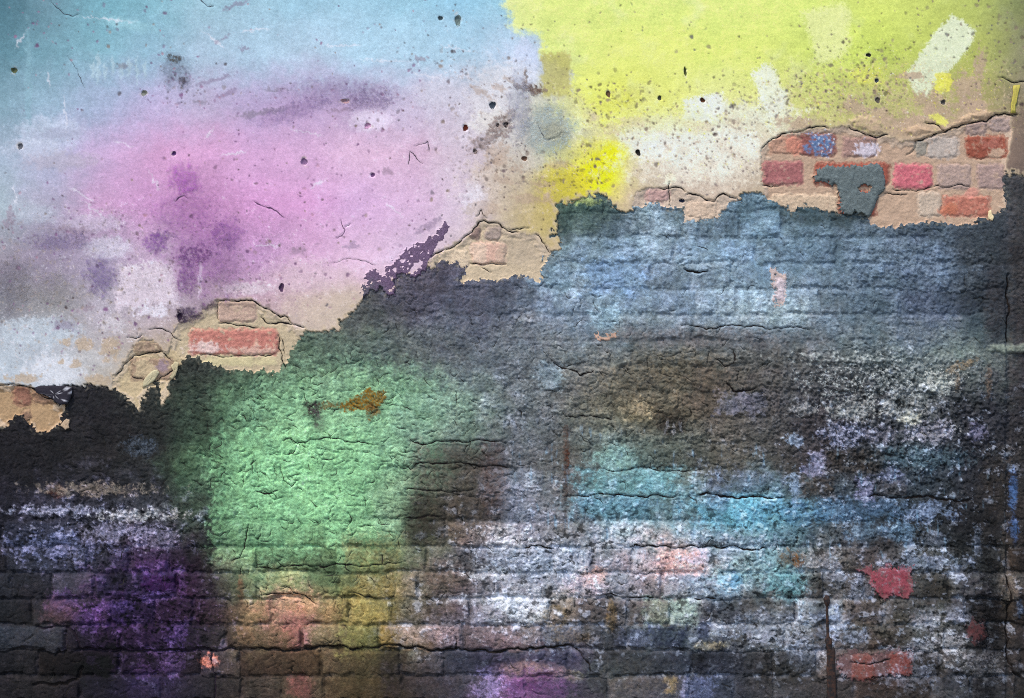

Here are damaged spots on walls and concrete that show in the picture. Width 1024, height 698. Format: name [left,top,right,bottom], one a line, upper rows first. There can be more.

flaking render [760,85,1020,229]
flaking render [360,219,553,300]
flaking render [0,384,72,432]
flaking render [112,299,304,411]
rust [322,387,386,421]
rust [823,595,836,698]